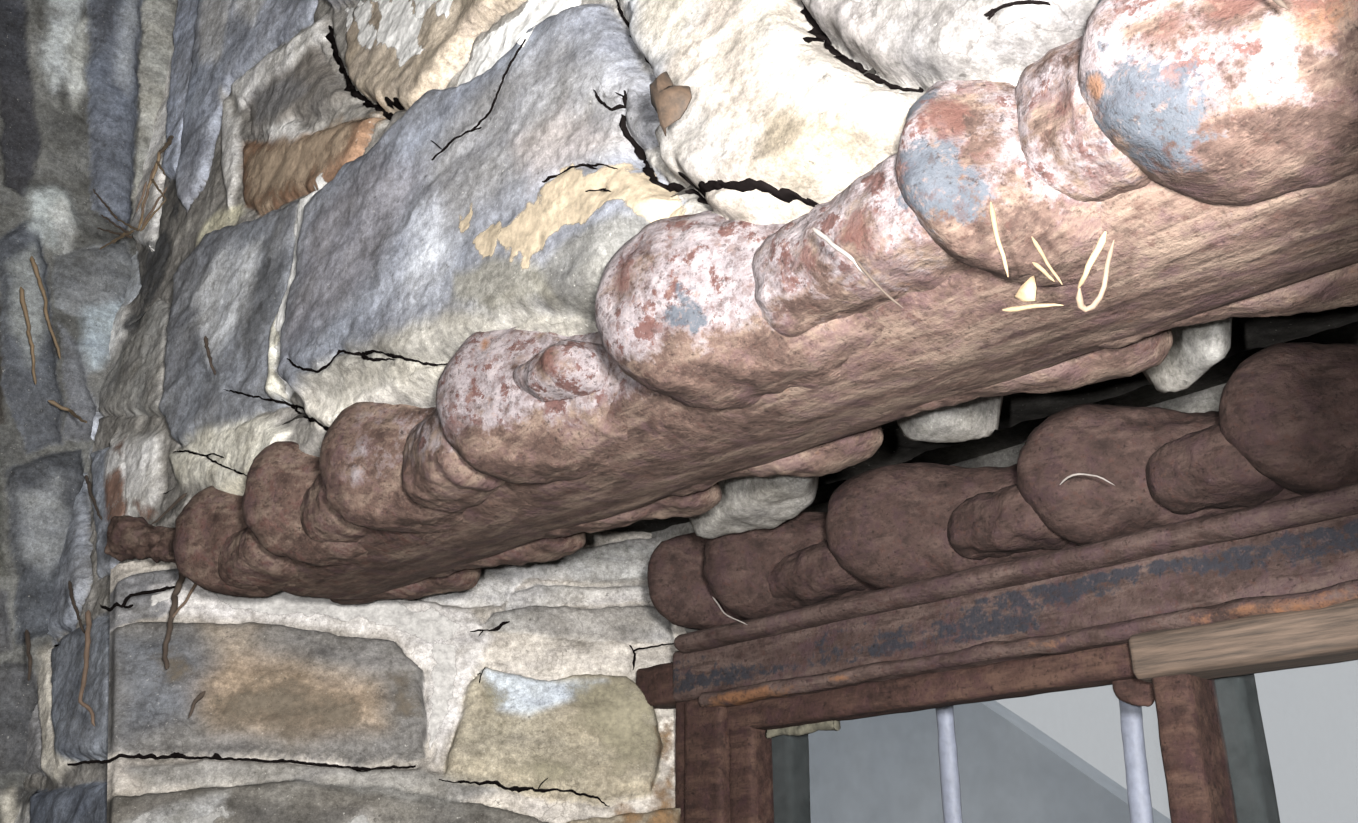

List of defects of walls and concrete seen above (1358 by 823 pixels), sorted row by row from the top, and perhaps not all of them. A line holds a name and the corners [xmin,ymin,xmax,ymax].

crack [325,25,405,121]
crack [430,39,526,161]
crack [616,0,652,68]
crack [800,1,924,93]
crack [542,89,818,207]
spalling [459,162,686,269]
crack [287,350,447,373]
crack [223,389,329,431]
rust [1112,679,1155,707]
crack [67,752,609,807]